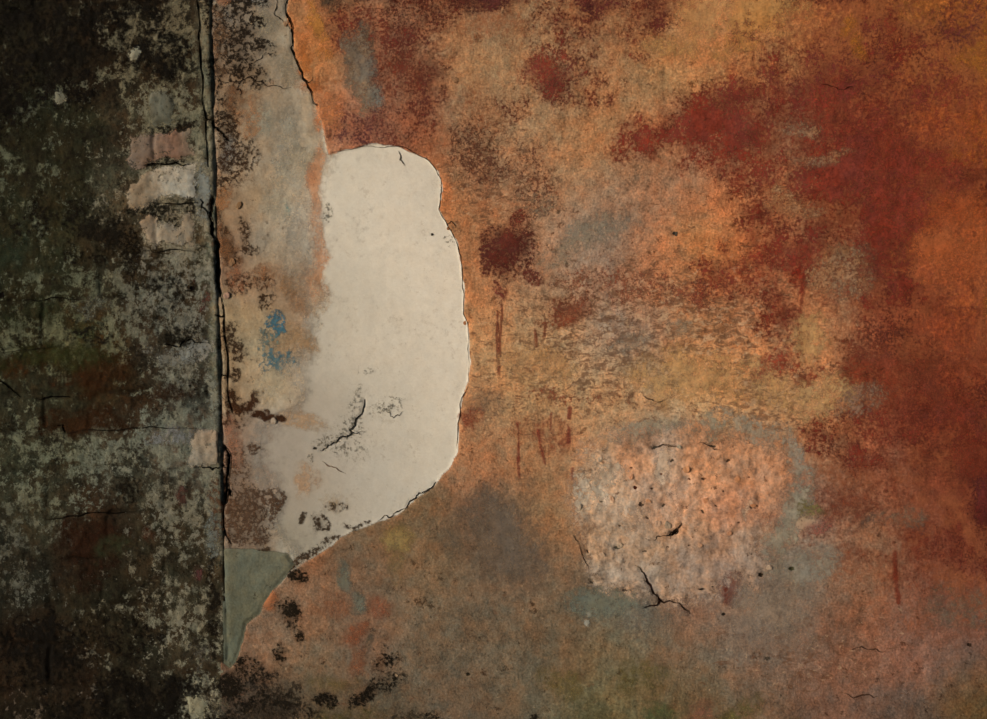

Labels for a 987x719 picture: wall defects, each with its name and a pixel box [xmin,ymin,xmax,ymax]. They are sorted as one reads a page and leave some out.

water stain [0,0,332,316]
crack [129,0,228,168]
crack [227,0,316,105]
peeling [494,0,683,122]
crack [145,198,232,412]
flaking render [187,0,510,559]
rust [479,209,544,373]
rust [534,294,592,347]
peeling [556,0,987,610]
water stain [0,320,407,719]
rust [532,406,572,464]
water stain [604,312,887,651]